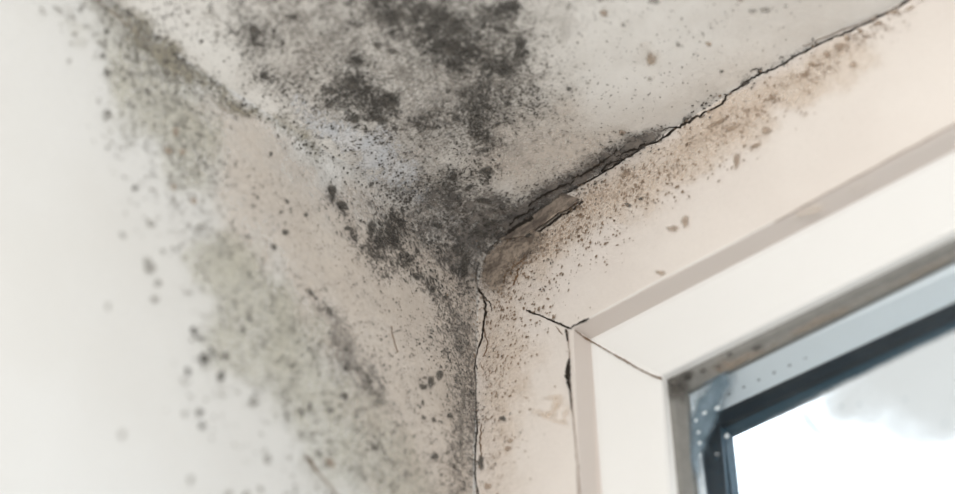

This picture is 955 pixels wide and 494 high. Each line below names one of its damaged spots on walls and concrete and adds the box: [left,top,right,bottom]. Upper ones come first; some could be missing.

leakage [54,0,756,494]
crack [473,0,955,494]
leakage [727,0,922,170]